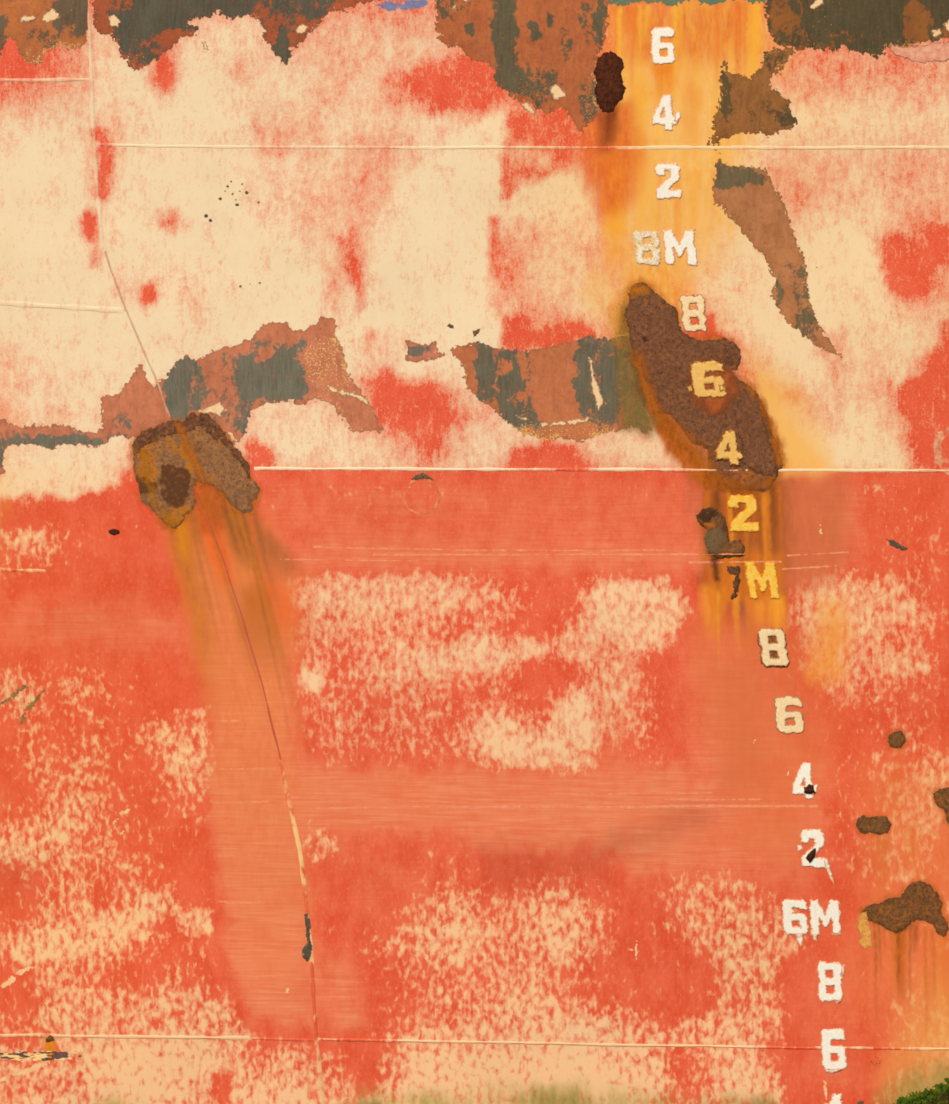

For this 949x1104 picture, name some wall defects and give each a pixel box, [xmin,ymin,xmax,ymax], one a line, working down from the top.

peeling [0,0,381,71]
peeling [434,0,611,133]
peeling [707,0,949,359]
peeling [0,316,384,475]
peeling [405,329,652,443]
corrosion [567,0,949,1093]
corrosion [131,412,327,1007]